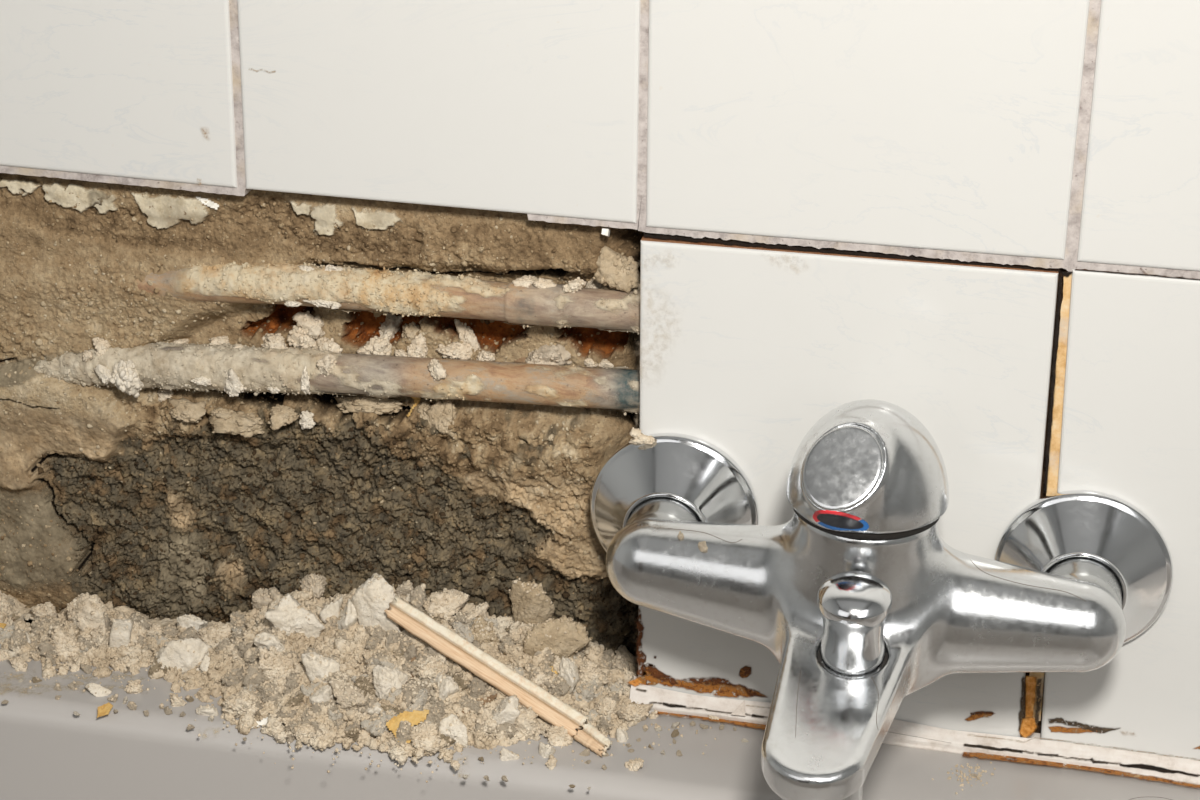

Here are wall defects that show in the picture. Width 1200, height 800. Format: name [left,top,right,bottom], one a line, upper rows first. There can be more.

rust [243,304,314,335]
rust [344,311,526,351]
rust [561,326,629,356]
spalling [0,173,650,638]
crack [31,453,95,572]
leakage [0,402,639,657]
rust [965,711,994,721]
rust [1018,676,1119,738]